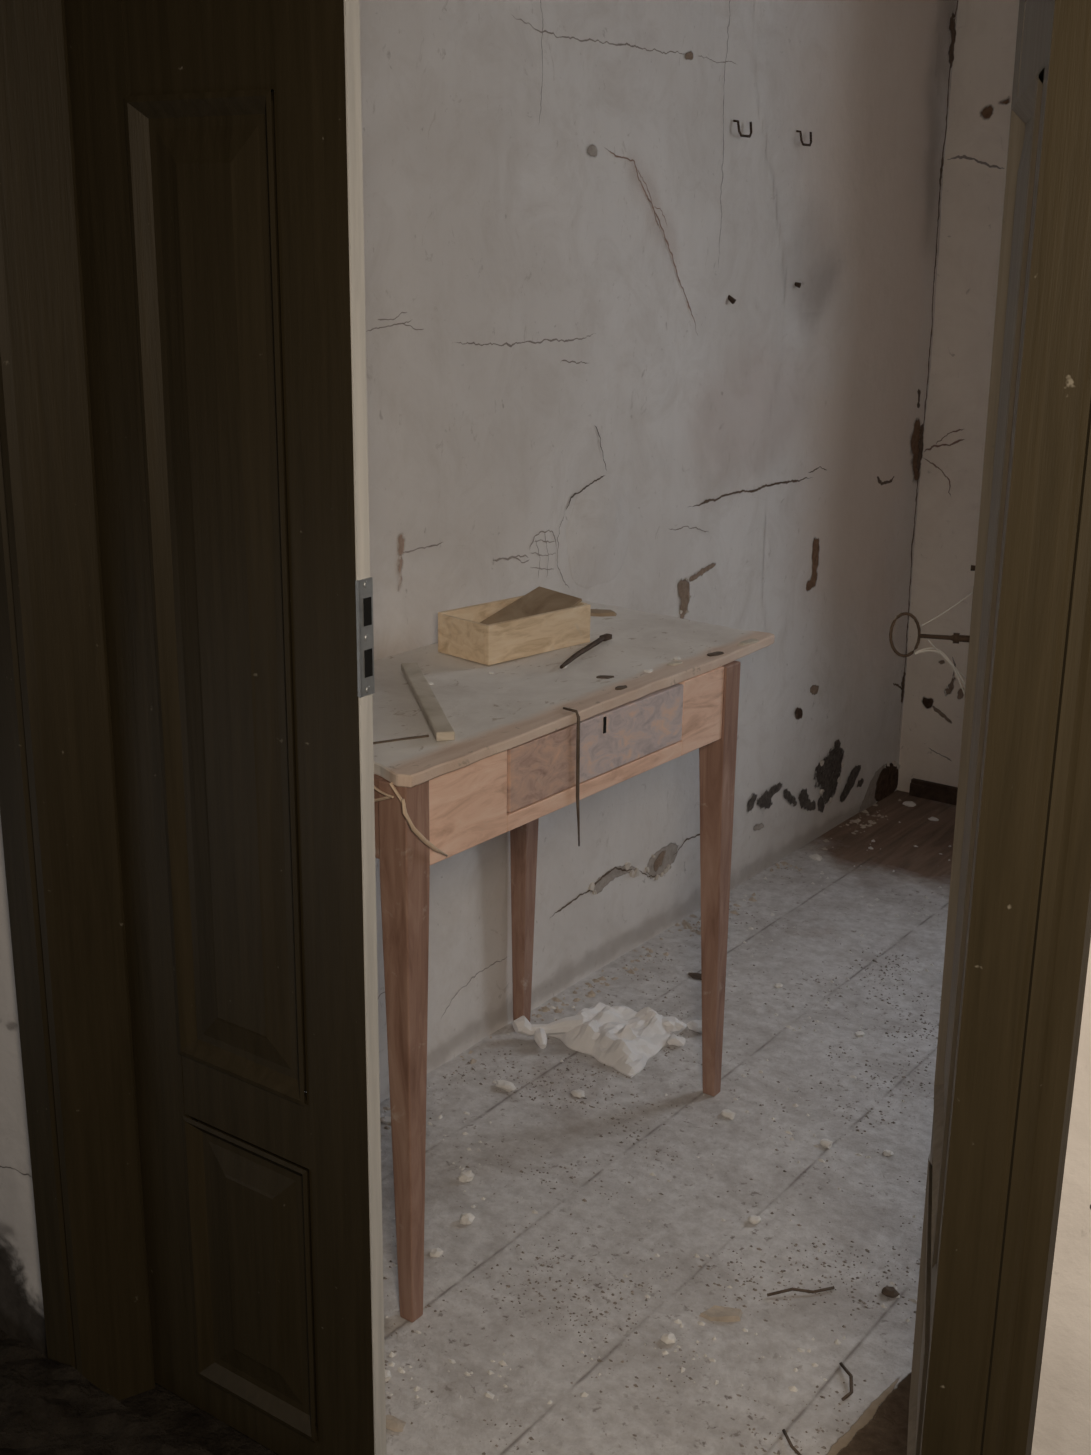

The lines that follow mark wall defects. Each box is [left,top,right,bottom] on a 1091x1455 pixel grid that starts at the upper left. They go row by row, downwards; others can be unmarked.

crack [513,1,736,263]
crack [608,150,698,335]
crack [368,312,423,331]
crack [457,335,591,364]
crack [877,0,1004,761]
corrosion [910,419,923,481]
crack [670,466,826,532]
corrosion [806,538,819,591]